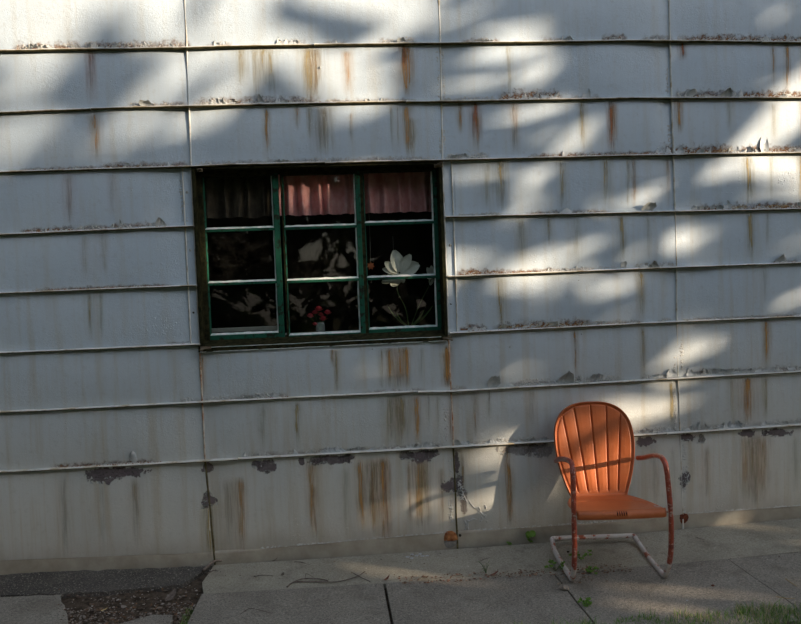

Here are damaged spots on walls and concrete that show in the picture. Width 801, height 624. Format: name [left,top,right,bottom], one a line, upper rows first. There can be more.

corrosion [402,47,410,89]
peeling [665,69,801,97]
peeling [528,124,801,157]
peeling [643,340,801,379]
peeling [633,421,794,447]
peeling [52,459,161,485]
peeling [241,435,550,523]
peeling [680,466,691,490]
peeling [201,490,218,509]